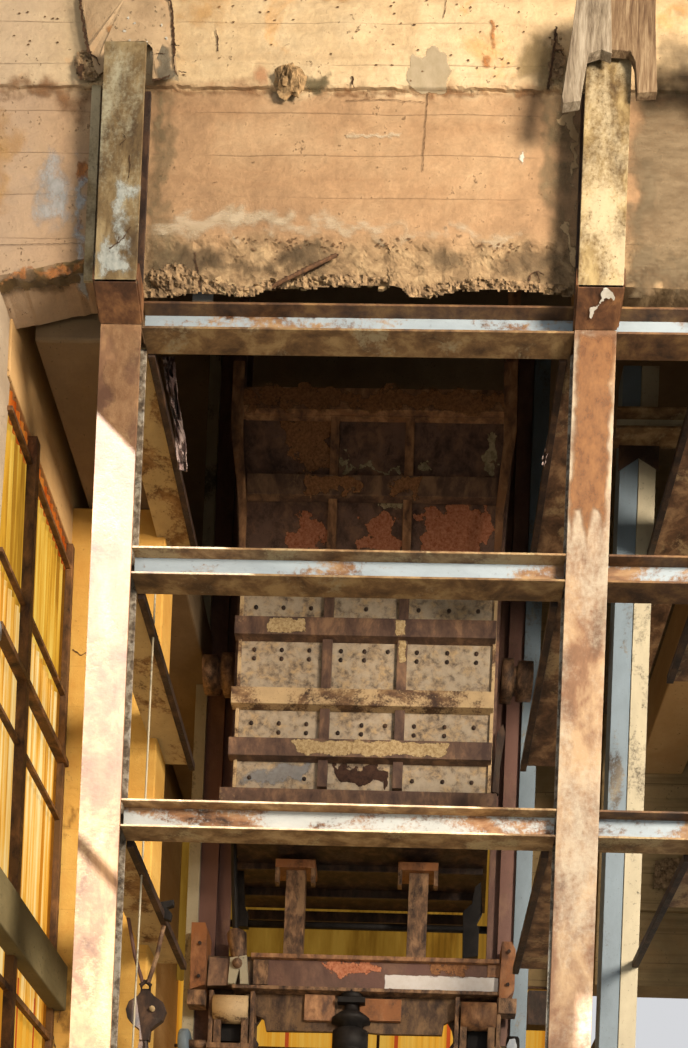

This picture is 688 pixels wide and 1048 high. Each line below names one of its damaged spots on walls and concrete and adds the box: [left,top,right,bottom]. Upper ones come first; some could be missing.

spalling [74,50,103,80]
leakage [674,47,688,79]
crack [345,76,428,171]
leakage [628,91,688,294]
leakage [155,207,264,270]
corrosion [2,263,82,283]
spalling [149,236,573,299]
peeling [590,288,615,318]
corrosion [321,961,382,979]